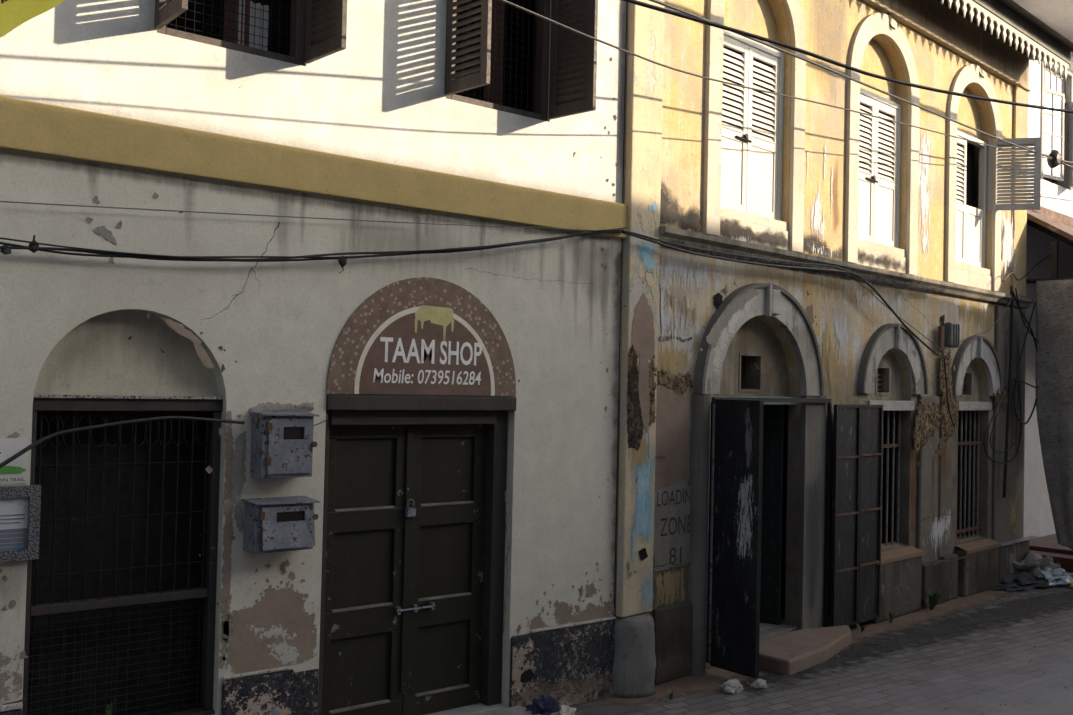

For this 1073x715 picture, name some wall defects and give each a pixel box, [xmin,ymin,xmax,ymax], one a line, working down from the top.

crack [202,222,280,320]
damp [660,185,943,293]
spalling [146,313,237,373]
damp [693,283,824,396]
damp [857,323,928,394]
spalling [627,241,759,610]
peeling [199,411,317,715]
peeling [0,646,28,705]
peeling [512,562,615,702]